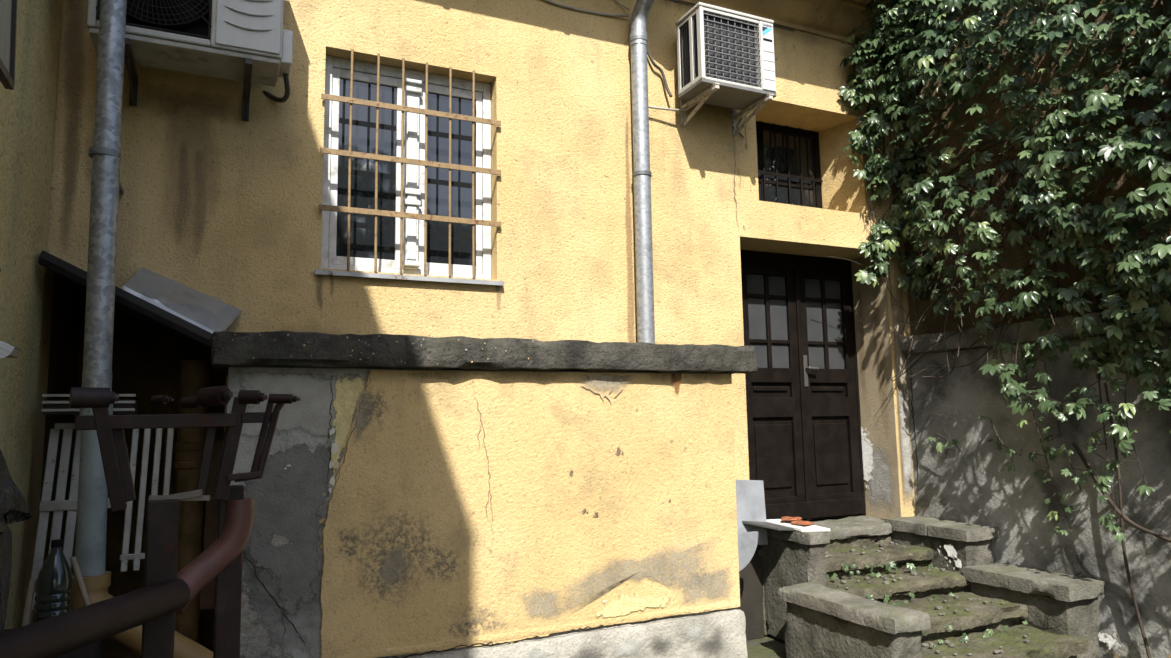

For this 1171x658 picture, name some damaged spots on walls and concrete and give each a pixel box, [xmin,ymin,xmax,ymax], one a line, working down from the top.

flaking render [238,371,375,615]
crack [474,391,493,546]
flaking render [240,580,293,658]
crack [243,552,313,658]
peeling [596,592,671,618]
damp [571,544,727,605]